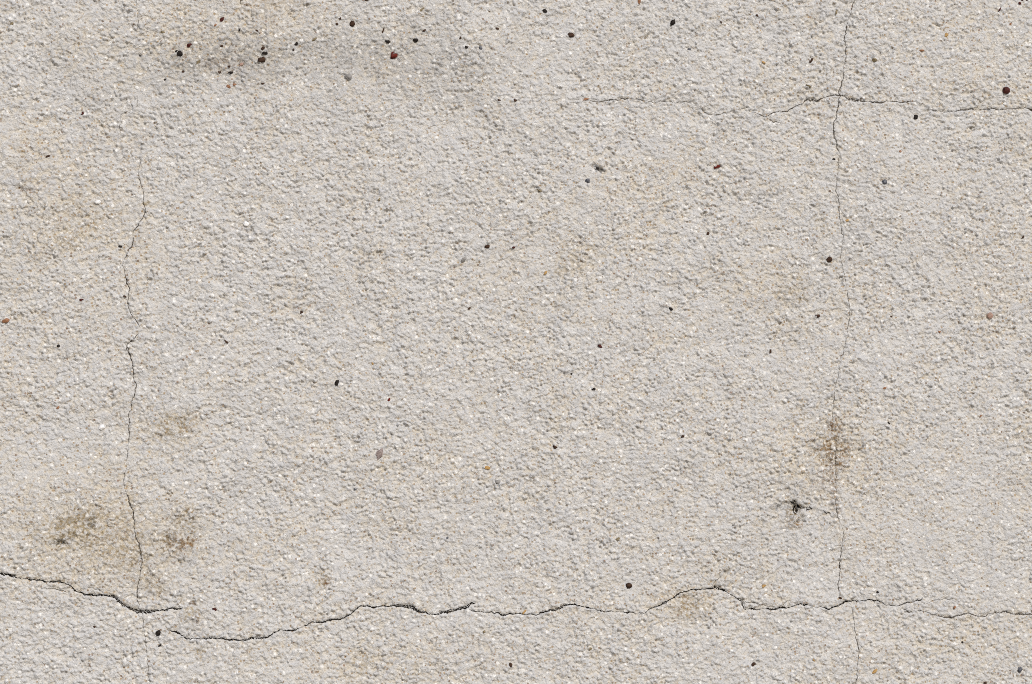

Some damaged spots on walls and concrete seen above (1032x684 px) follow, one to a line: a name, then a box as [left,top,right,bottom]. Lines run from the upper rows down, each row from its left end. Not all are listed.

crack [0,161,182,684]
crack [168,531,1032,684]
crack [583,0,916,518]
crack [930,105,1032,113]